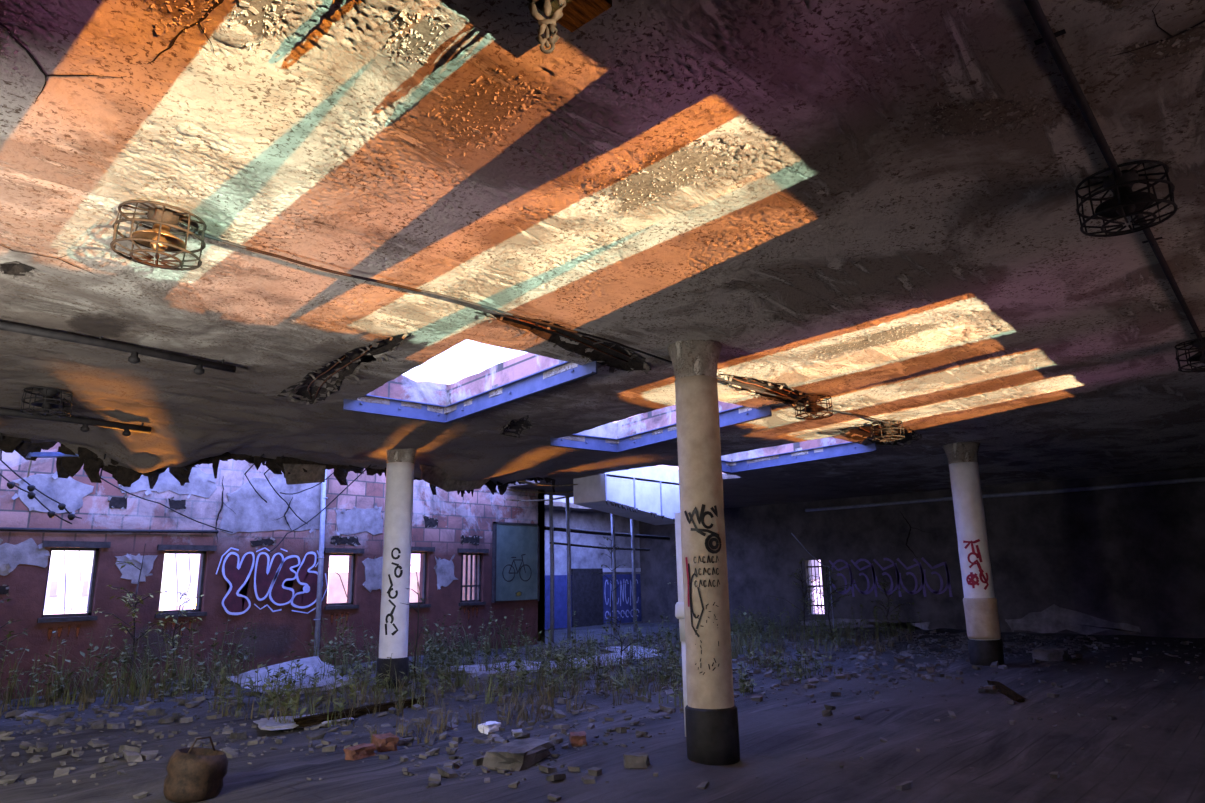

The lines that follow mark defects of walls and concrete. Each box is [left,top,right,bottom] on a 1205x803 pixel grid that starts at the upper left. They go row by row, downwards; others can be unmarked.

crack [0,0,224,102]
flaking render [12,471,94,514]
flaking render [107,465,383,549]
spalling [423,514,438,528]
flaking render [115,553,158,584]
flaking render [362,557,383,593]